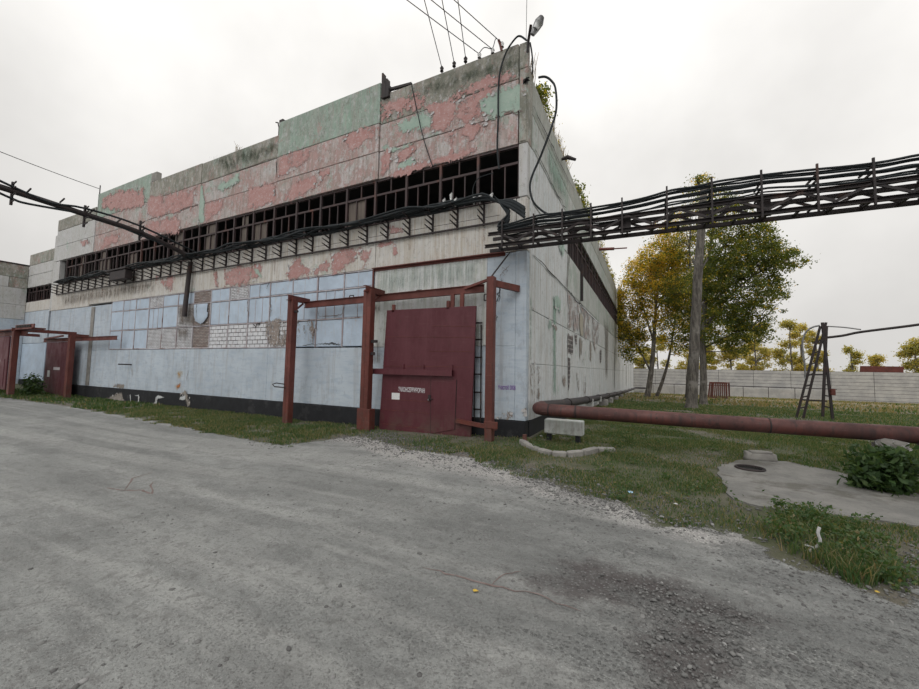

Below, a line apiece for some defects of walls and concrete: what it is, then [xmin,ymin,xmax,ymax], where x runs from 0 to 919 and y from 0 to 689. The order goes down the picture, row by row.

peeling [342,71,526,178]
peeling [101,173,240,237]
peeling [247,146,330,210]
peeling [213,263,262,288]
flaking render [549,294,602,395]